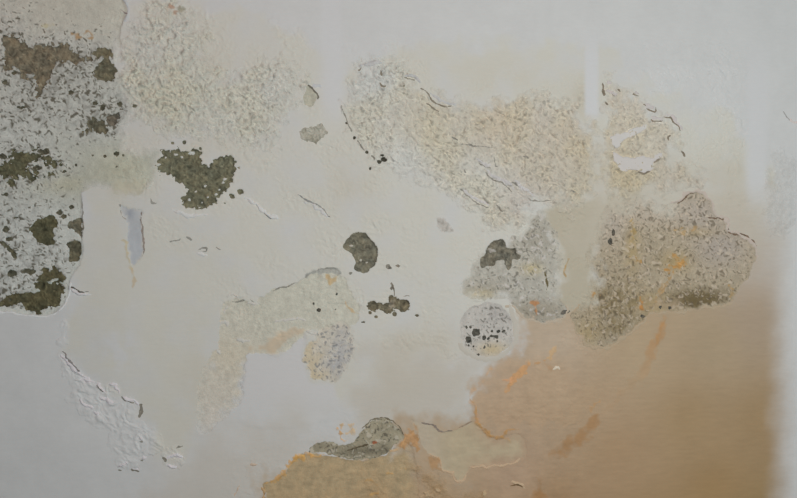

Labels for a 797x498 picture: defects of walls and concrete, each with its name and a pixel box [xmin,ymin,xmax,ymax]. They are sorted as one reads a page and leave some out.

spalling [0,0,322,318]
peeling [299,123,328,144]
peeling [338,51,758,362]
spalling [301,320,355,384]
leakage [413,180,797,498]
leakage [245,457,283,498]
peeling [261,417,528,498]